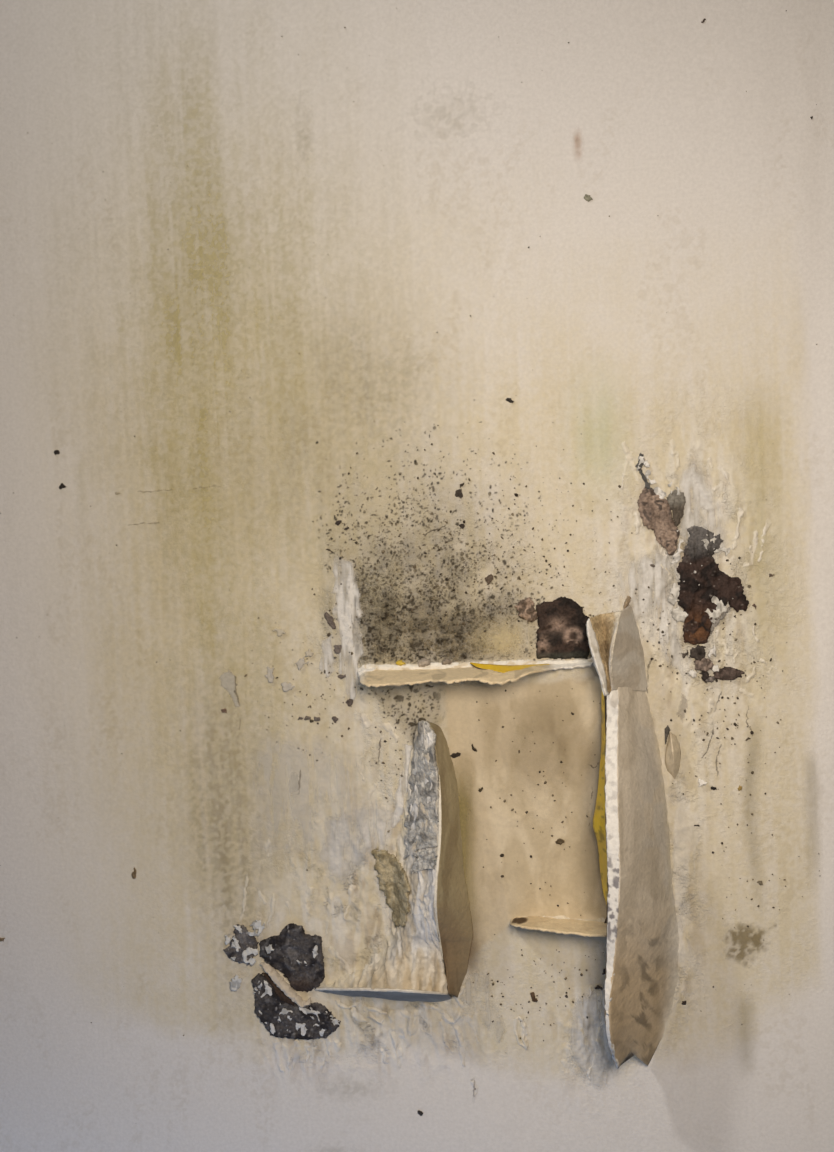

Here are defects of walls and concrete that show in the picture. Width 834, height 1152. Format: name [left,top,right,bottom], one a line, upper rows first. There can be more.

leakage [187,205,229,346]
leakage [320,449,553,664]
leakage [360,684,435,735]
peeling [223,720,473,1040]
peeling [357,596,679,1069]